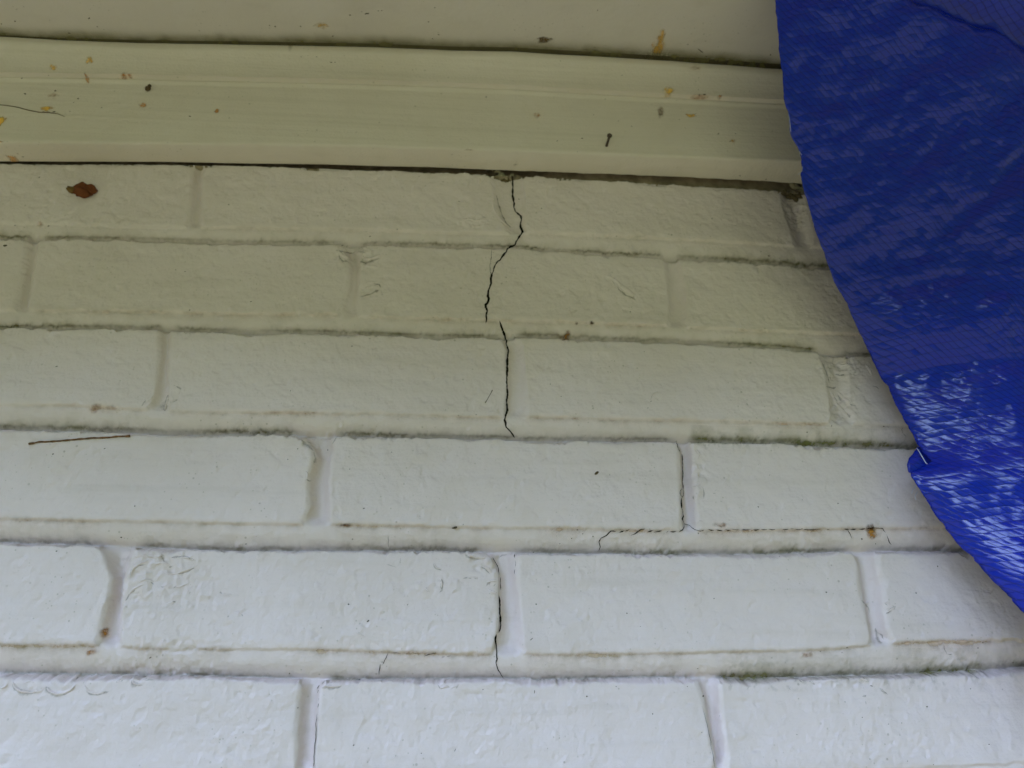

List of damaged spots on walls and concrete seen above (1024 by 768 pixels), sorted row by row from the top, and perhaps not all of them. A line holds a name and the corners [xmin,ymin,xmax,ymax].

crack [484,176,524,438]
crack [599,443,891,550]
crack [493,554,516,679]